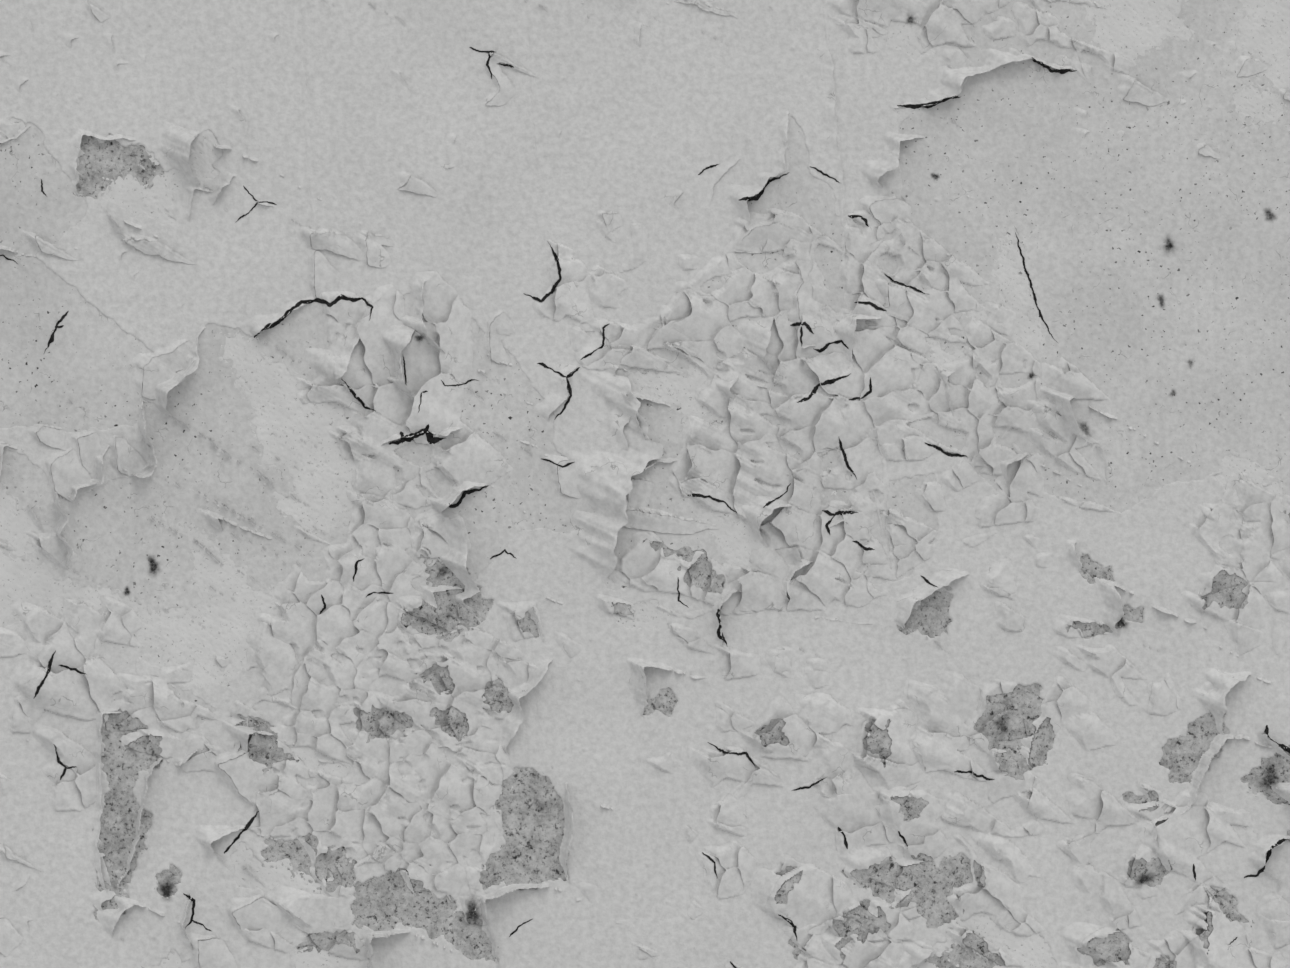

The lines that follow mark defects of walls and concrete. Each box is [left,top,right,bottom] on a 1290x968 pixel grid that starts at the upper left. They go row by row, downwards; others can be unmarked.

crack [1015,232,1058,343]
peeling [881,567,970,655]
peeling [1052,539,1207,672]
peeling [1181,496,1290,657]